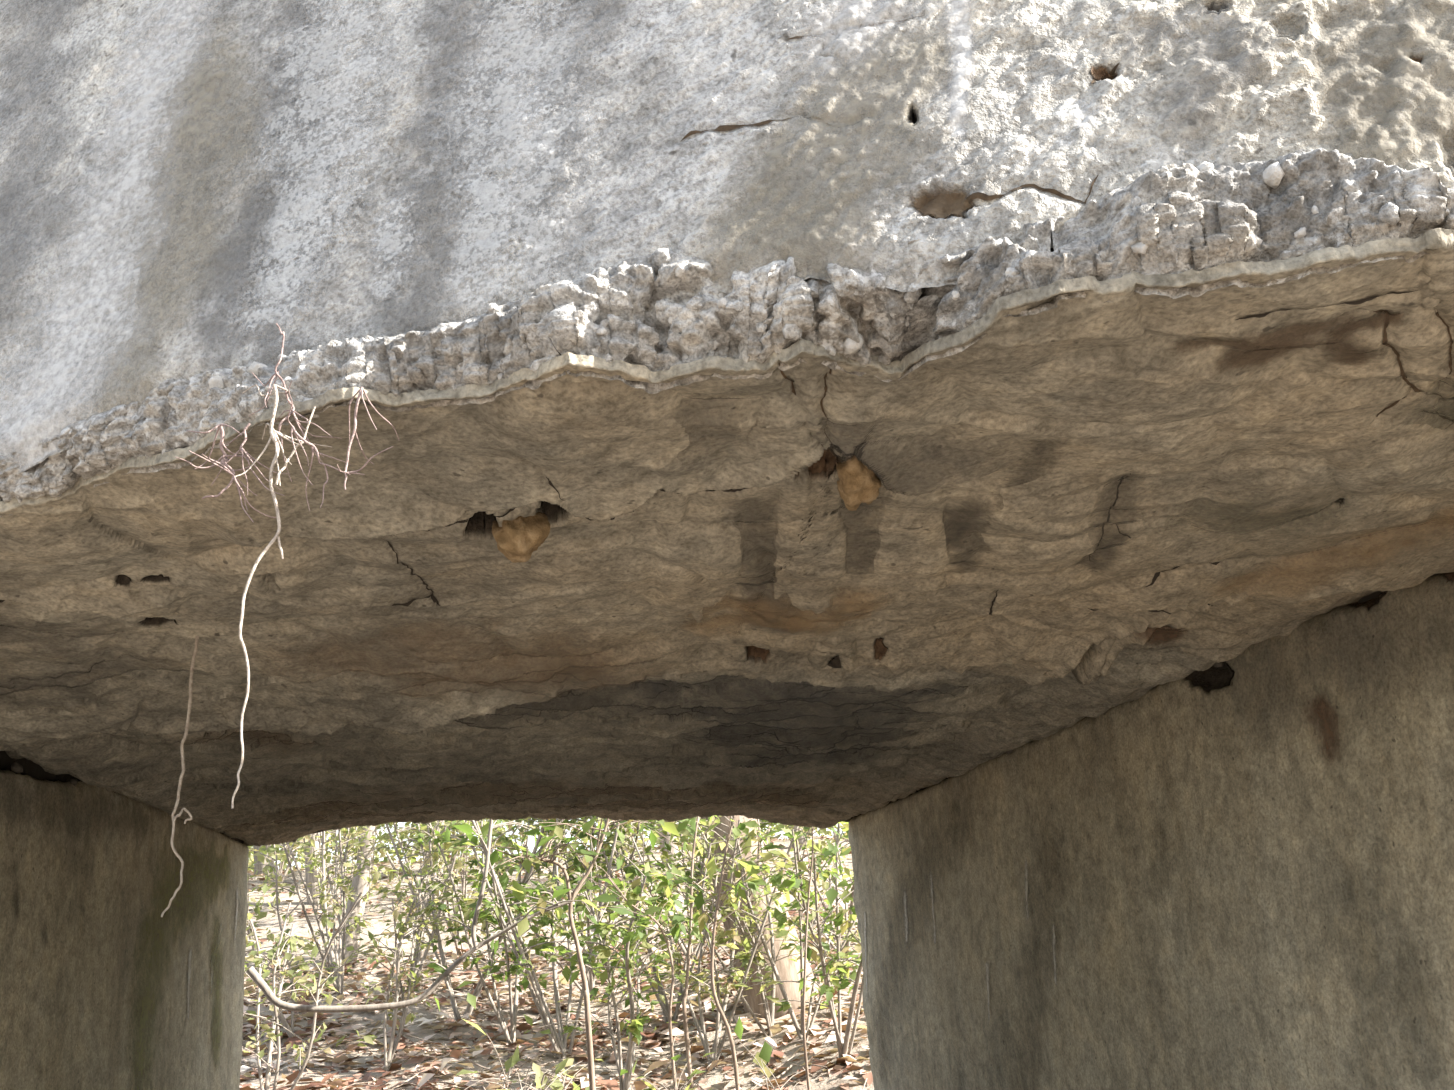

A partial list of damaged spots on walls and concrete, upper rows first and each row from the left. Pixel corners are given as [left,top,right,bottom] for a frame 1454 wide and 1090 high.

spalling [1091,66,1118,81]
water stain [375,0,617,311]
crack [681,117,808,141]
water stain [713,0,972,269]
crack [967,175,1098,204]
water stain [1055,103,1096,145]
water stain [1142,149,1238,171]
spalling [0,148,1454,517]
crack [1236,290,1454,422]
crack [779,363,881,478]
crack [546,477,750,521]
crack [381,538,440,606]